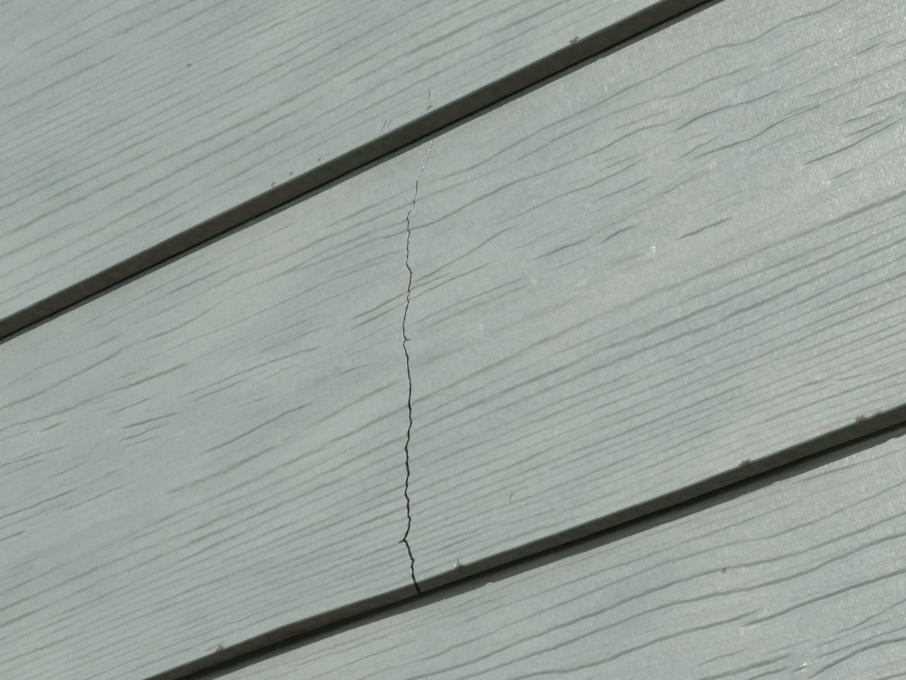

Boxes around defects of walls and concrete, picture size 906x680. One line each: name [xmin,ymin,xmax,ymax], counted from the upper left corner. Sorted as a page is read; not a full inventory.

crack [399,141,433,591]